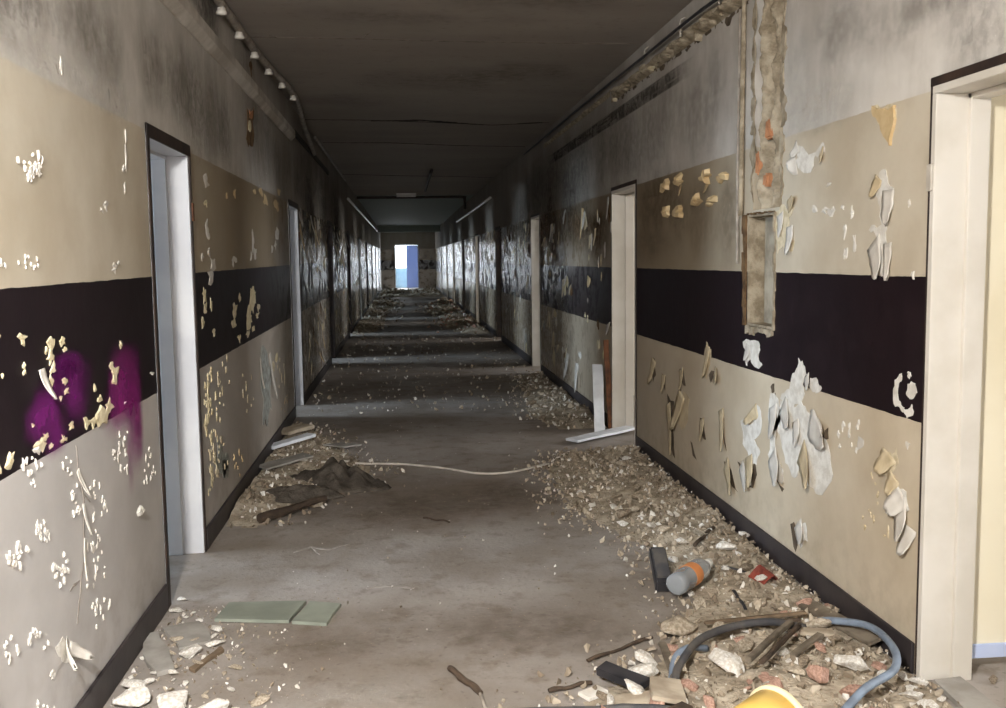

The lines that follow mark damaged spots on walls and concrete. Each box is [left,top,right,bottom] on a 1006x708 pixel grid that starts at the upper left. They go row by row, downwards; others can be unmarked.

flaking render [543,0,825,255]
peeling [812,169,895,281]
peeling [231,286,260,342]
spalling [39,336,69,402]
spalling [109,361,119,385]
peeling [743,339,762,369]
spalling [0,451,15,474]
spalling [31,384,127,455]
peeling [718,358,833,496]
peeling [873,441,916,556]
crack [70,445,93,624]
peeling [49,636,95,680]